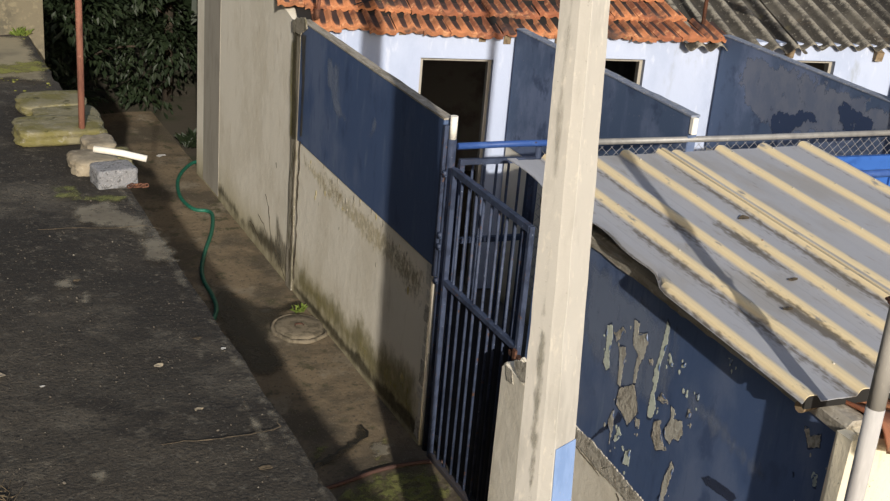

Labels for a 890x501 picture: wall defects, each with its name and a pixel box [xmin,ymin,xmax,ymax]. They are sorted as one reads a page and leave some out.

leakage [250,224,293,276]
peeling [575,318,699,501]